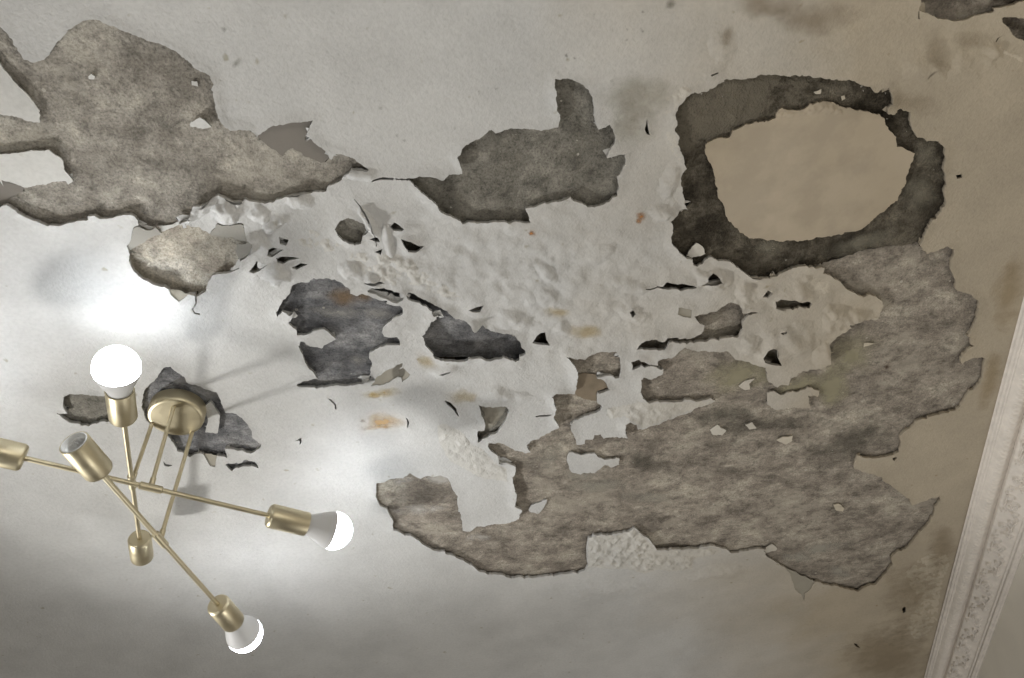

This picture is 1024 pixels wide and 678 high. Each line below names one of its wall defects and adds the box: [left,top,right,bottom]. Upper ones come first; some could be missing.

peeling [921,0,1024,40]
peeling [0,19,367,309]
peeling [63,394,108,424]
peeling [142,367,261,466]
peeling [277,230,525,386]
peeling [376,74,983,599]